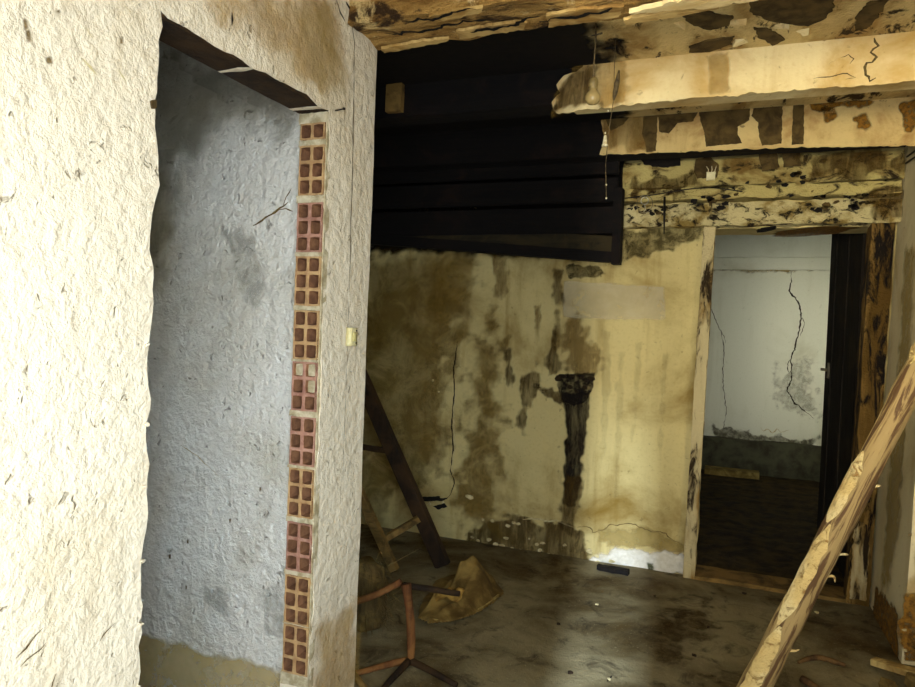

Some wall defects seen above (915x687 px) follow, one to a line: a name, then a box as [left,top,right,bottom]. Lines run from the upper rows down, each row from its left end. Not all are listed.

peeling [552,0,915,213]
leakage [372,202,613,213]
leakage [373,161,699,206]
spalling [627,206,668,222]
leakage [362,438,400,501]
leakage [366,245,476,486]
crack [423,341,473,510]
leakage [454,314,600,535]
crack [711,309,727,428]
crack [787,278,813,418]
spalling [467,515,684,560]
rust [873,587,915,661]